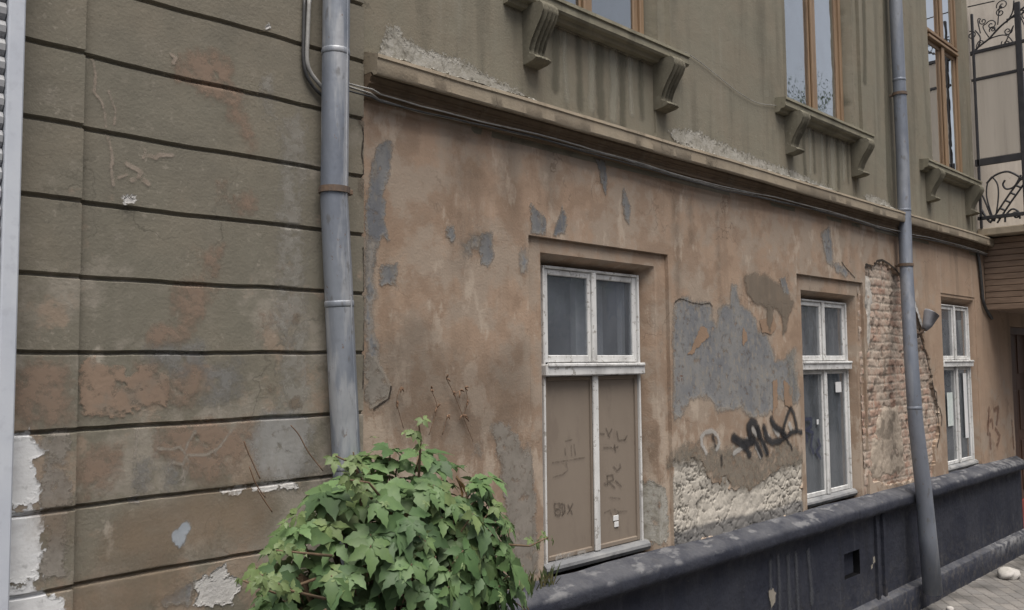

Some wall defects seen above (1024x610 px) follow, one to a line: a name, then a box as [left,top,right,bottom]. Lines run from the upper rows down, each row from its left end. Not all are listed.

peeling [378,23,537,101]
peeling [668,128,841,193]
peeling [358,116,398,410]
peeling [445,226,495,267]
peeling [530,203,567,236]
peeling [9,284,241,610]
peeling [155,397,311,496]
peeling [672,284,801,420]
flaking render [821,226,914,495]
flaking render [916,317,938,477]
spalling [643,455,803,545]